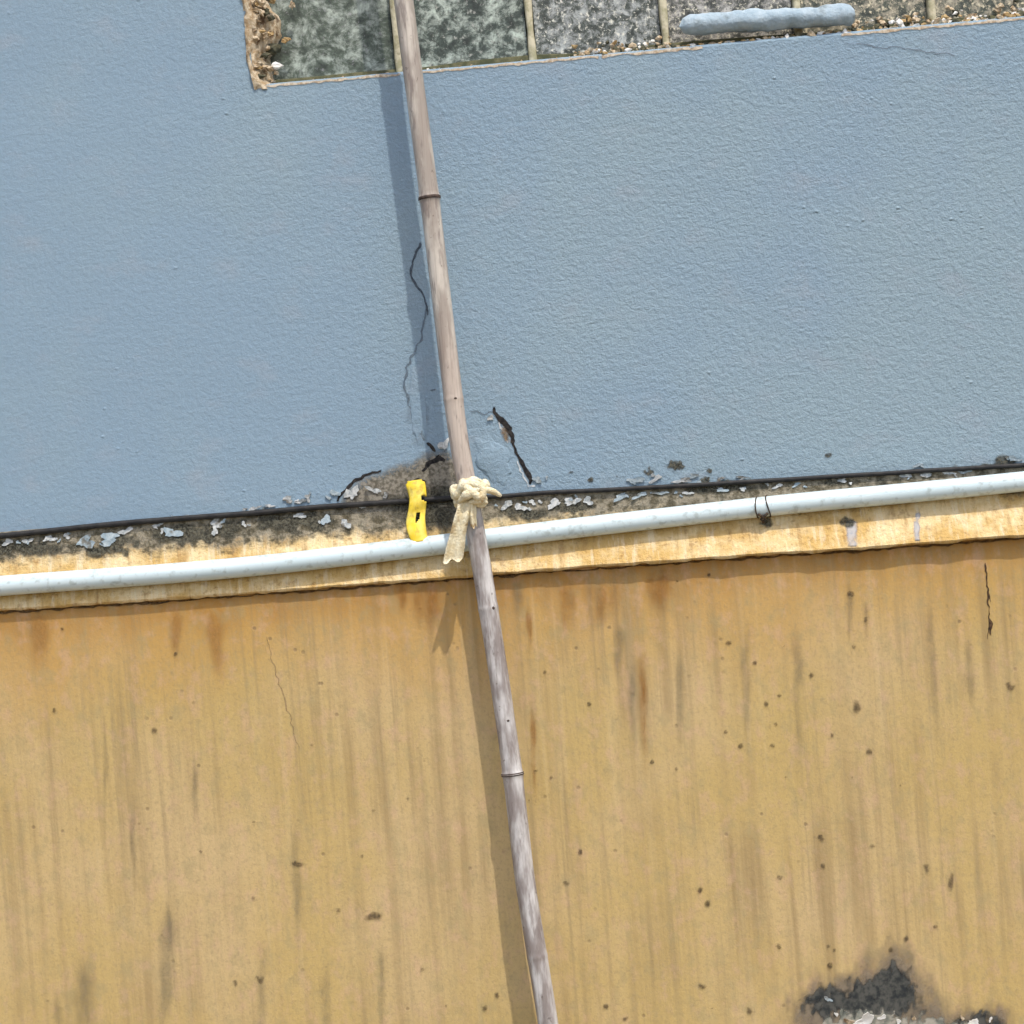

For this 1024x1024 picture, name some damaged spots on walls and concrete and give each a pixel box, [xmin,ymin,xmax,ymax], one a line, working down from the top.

crack [403,243,435,408]
crack [471,407,535,487]
flaking render [318,437,457,528]
water stain [679,469,767,494]
peeling [2,526,133,548]
water stain [0,533,139,557]
peeling [152,515,183,537]
water stain [153,508,334,546]
peeling [494,494,593,511]
water stain [506,500,596,520]
crack [0,537,1024,639]
flaking render [796,949,1006,1024]